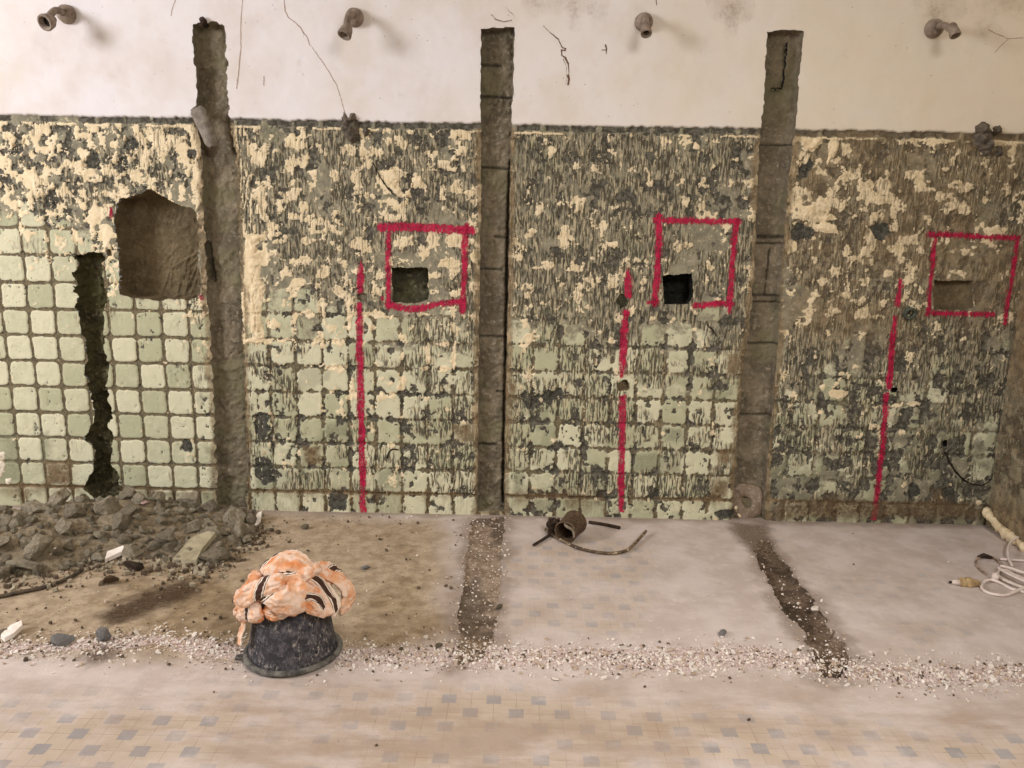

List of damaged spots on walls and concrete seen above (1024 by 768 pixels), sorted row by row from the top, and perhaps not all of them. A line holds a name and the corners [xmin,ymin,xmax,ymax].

crack [284,0,345,112]
crack [546,29,570,85]
crack [771,43,788,90]
peeling [383,169,422,198]
peeling [795,137,839,186]
peeling [791,205,839,242]
spalling [865,222,890,244]
peeling [241,234,266,345]
spalling [520,385,566,410]
spalling [253,407,275,485]
spalling [328,491,354,511]
spalling [714,506,741,520]